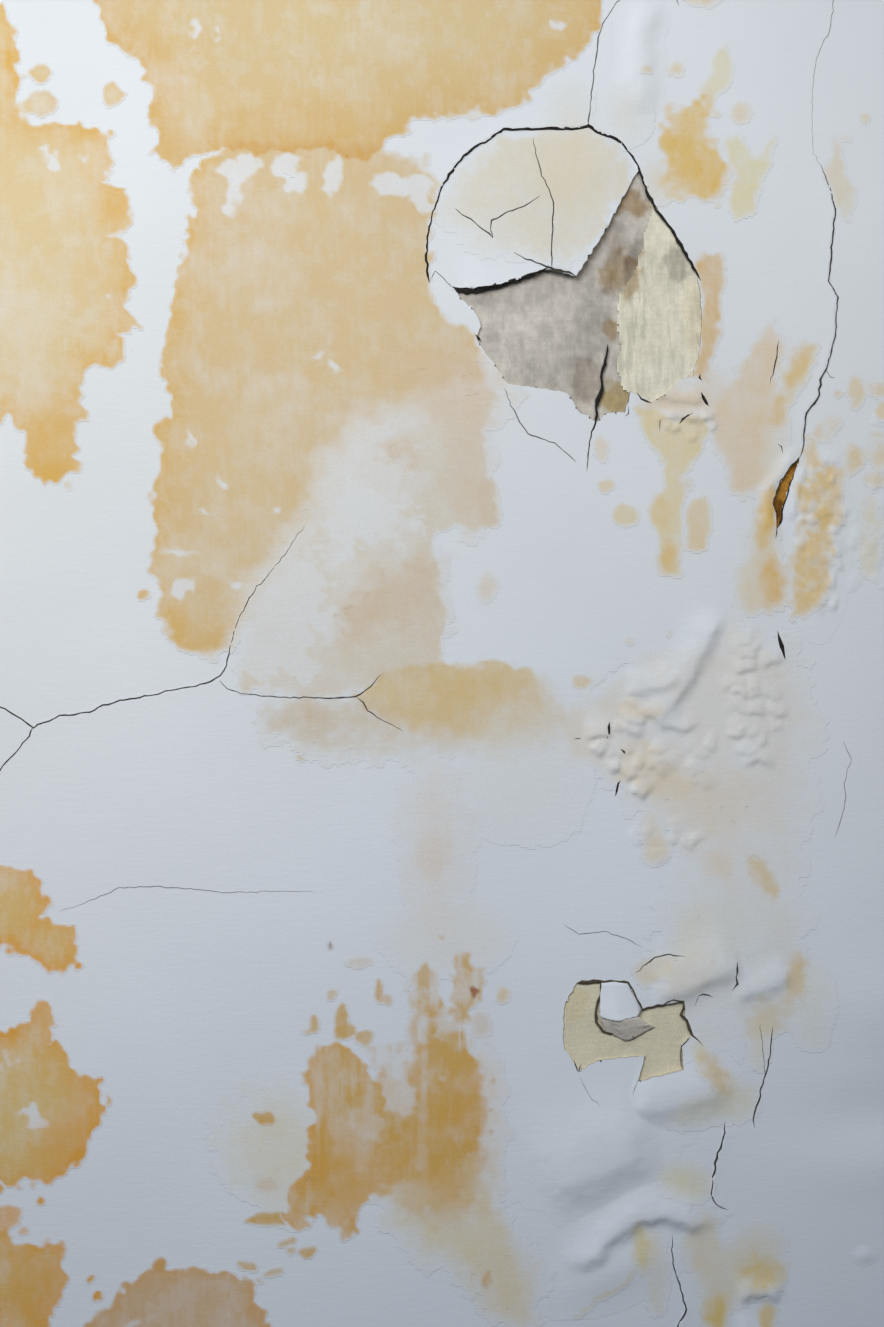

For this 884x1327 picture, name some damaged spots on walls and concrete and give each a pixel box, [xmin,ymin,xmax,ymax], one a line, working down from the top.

water stain [0,1,144,491]
crack [425,0,701,294]
spalling [456,171,702,421]
crack [773,0,839,536]
water stain [92,0,829,980]
crack [0,527,401,771]
water stain [0,864,85,976]
water stain [0,998,273,1327]
water stain [203,1074,316,1232]
peeling [563,979,701,1082]
crack [671,1238,687,1327]
crack [711,1027,773,1210]